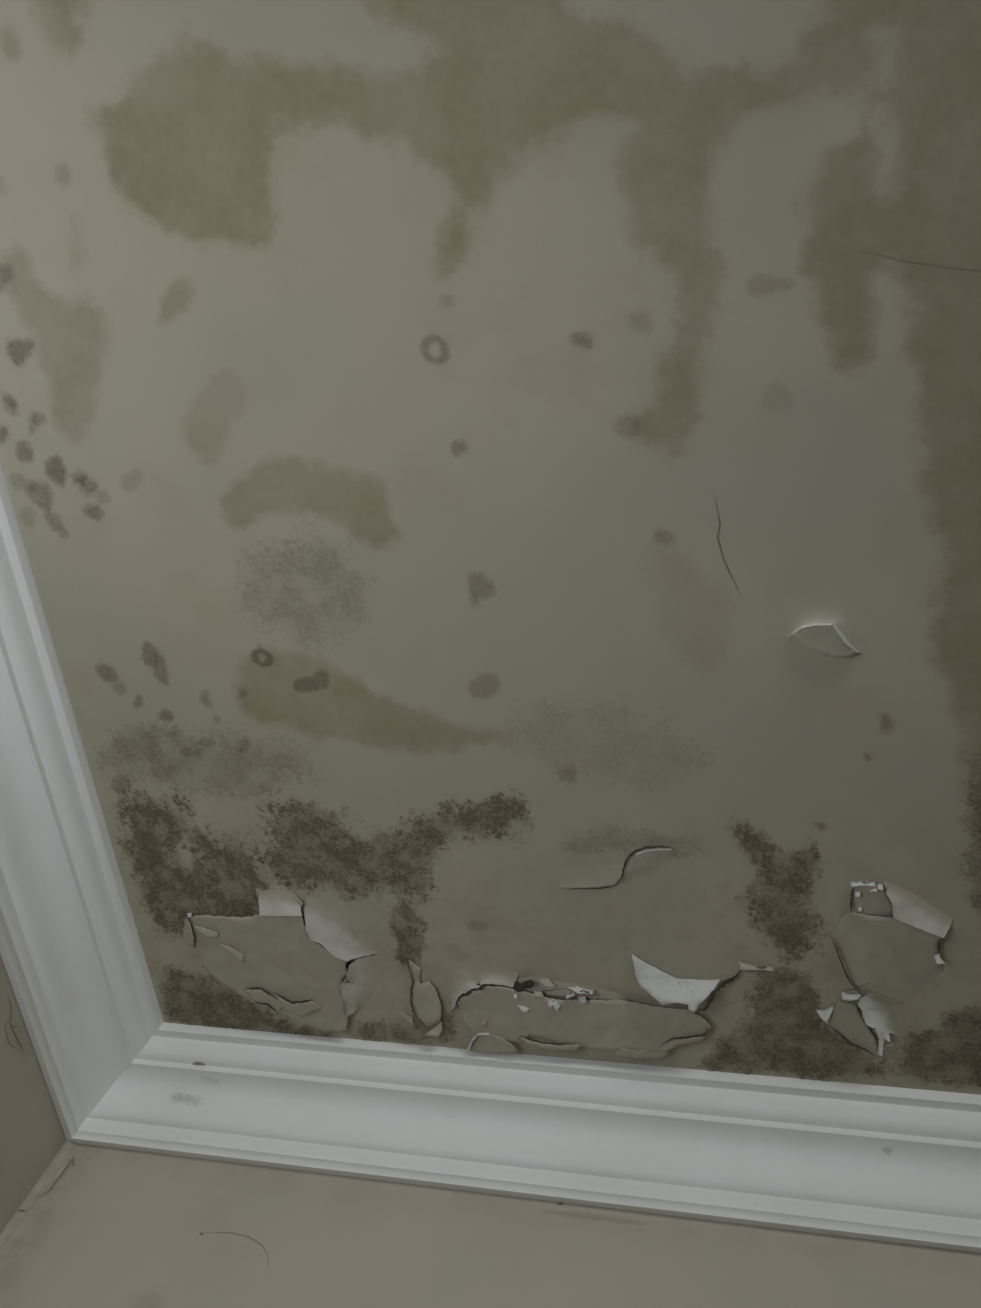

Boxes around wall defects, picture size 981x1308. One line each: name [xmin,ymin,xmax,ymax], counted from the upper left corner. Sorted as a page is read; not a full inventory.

leakage [0,0,981,864]
peeling [784,589,870,658]
leakage [162,969,331,1036]
peeling [182,886,385,1032]
mould [117,791,529,966]
peeling [396,954,775,1059]
leakage [705,823,981,1086]
peeling [816,881,952,1059]